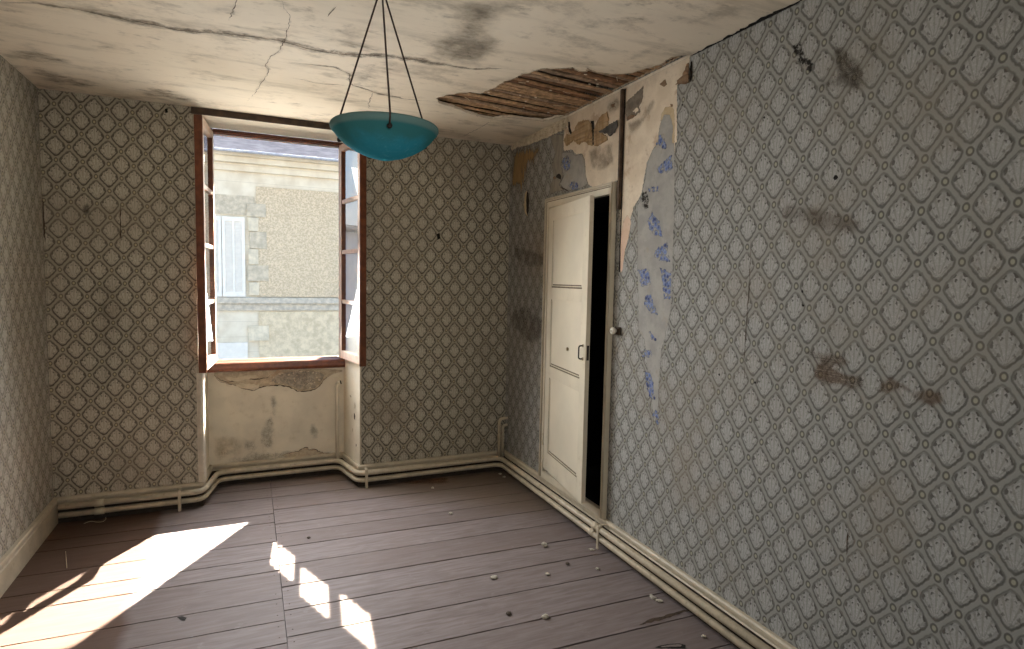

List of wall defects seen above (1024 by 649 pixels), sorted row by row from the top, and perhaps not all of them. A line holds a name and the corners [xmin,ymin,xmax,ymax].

crack [36,0,479,108]
damp [793,43,813,72]
flaking render [511,57,690,272]
flaking render [214,369,342,392]